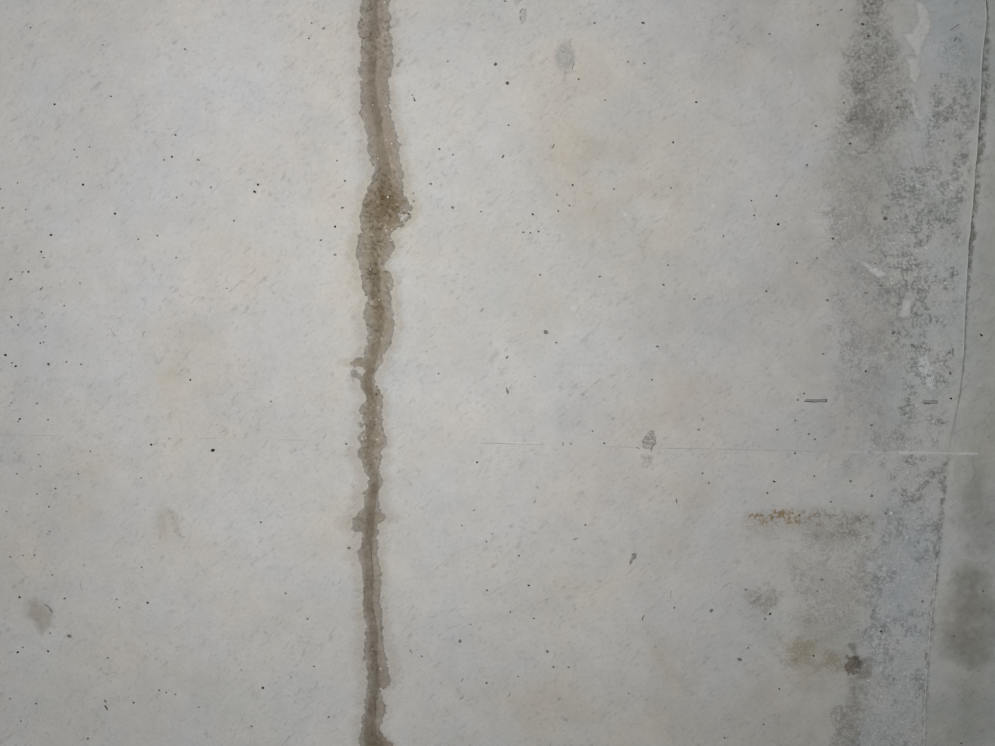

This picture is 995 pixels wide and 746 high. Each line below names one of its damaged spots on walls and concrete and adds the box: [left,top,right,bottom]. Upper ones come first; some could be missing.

damp [344,0,417,746]
damp [903,0,933,120]